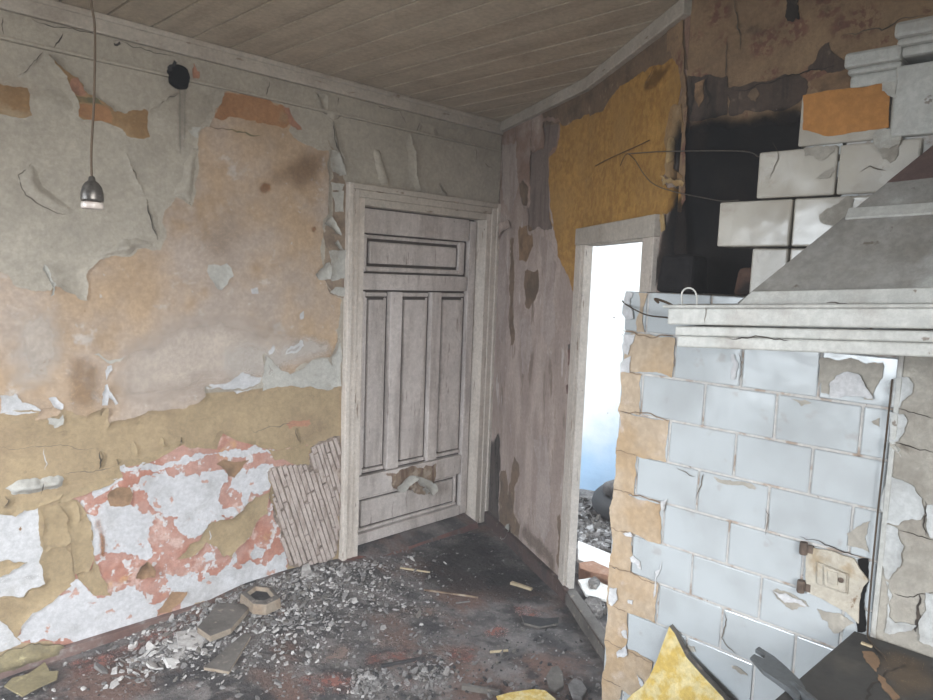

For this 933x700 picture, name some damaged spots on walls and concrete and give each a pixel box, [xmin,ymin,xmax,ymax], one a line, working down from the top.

peeling [0,75,41,127]
peeling [43,51,156,147]
peeling [661,42,911,187]
peeling [0,89,347,432]
peeling [497,116,561,345]
flaking render [818,357,884,400]
flaking render [0,430,366,652]
peeling [397,475,438,496]
peeling [498,452,522,540]
peeling [601,291,675,700]
crack [803,537,864,558]